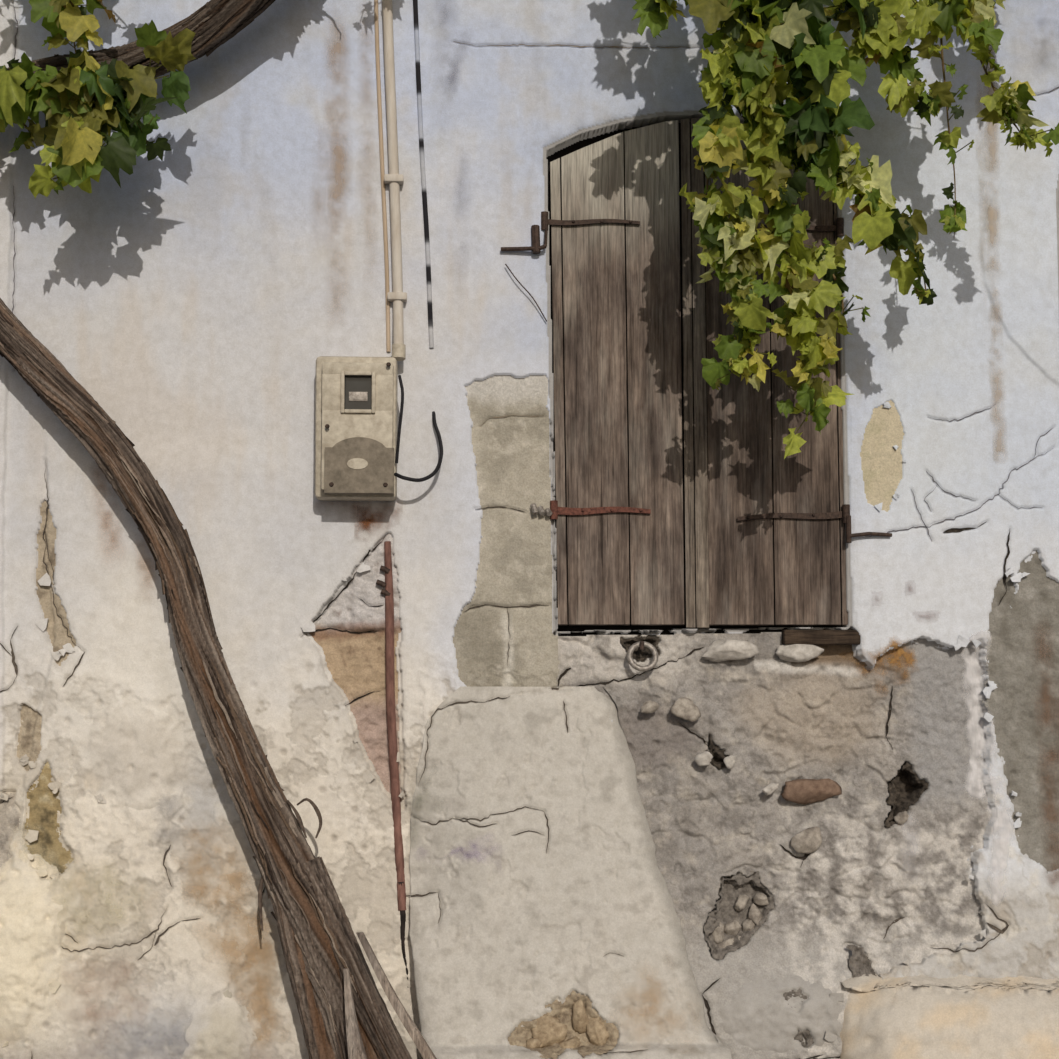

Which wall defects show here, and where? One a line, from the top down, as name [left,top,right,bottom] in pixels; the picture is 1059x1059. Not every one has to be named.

crack [453,40,692,48]
peeling [35,500,76,666]
rust [361,511,382,527]
crack [866,429,1051,541]
crack [998,532,1010,606]
spalling [0,704,73,879]
spalling [301,533,405,802]
crack [418,697,508,785]
crack [415,806,549,848]
spalling [453,375,1059,1059]
rust [875,641,915,677]
crack [62,844,200,960]